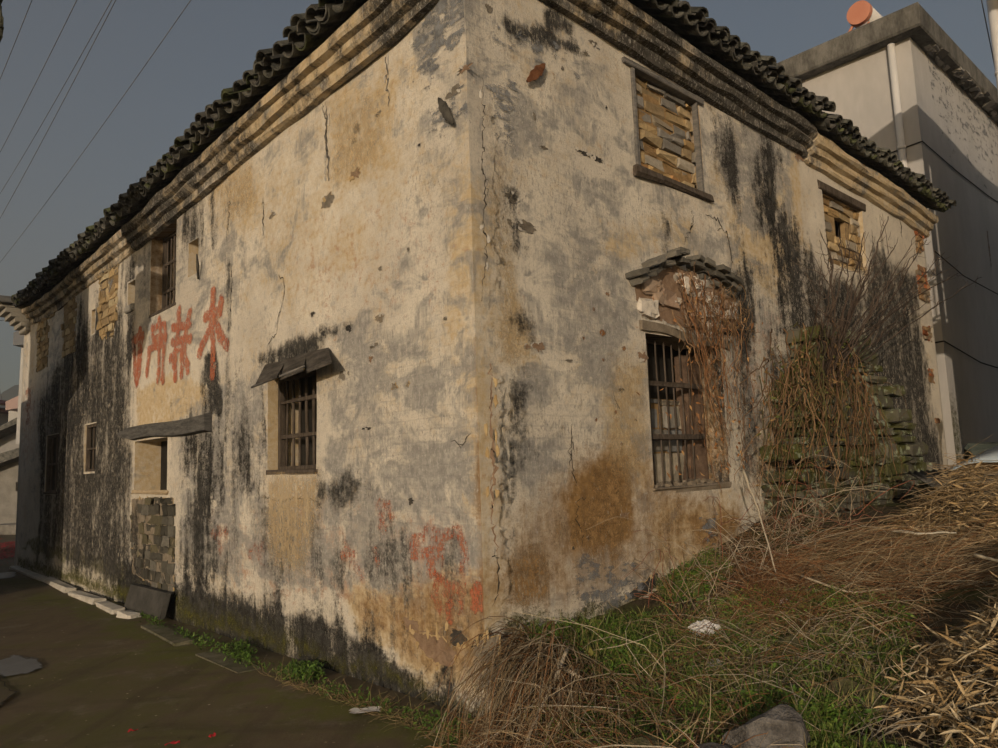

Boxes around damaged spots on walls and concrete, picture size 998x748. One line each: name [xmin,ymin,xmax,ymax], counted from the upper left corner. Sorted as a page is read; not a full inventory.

crack [322,103,330,181]
spalling [321,192,334,209]
crack [383,52,391,104]
crack [479,78,491,301]
leakage [498,187,531,357]
spalling [634,265,738,338]
leakage [716,129,741,213]
leakage [736,252,756,407]
leakage [752,136,943,471]
leakage [36,257,466,714]